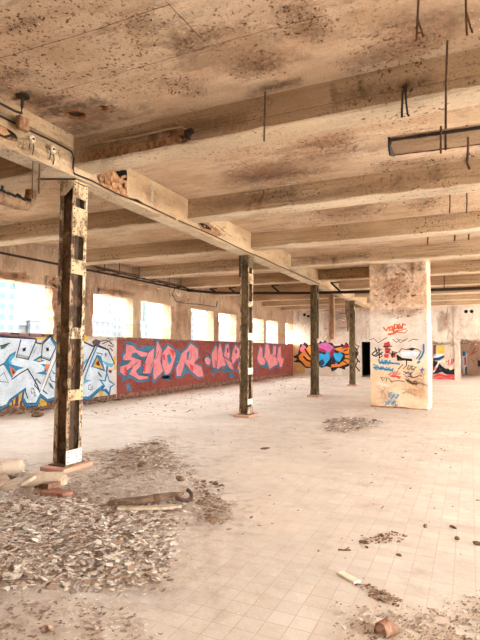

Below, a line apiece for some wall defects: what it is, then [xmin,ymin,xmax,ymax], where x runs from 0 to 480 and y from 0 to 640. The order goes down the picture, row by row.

spalling [82,136,182,163]
spalling [98,170,143,204]
peeling [374,273,425,319]